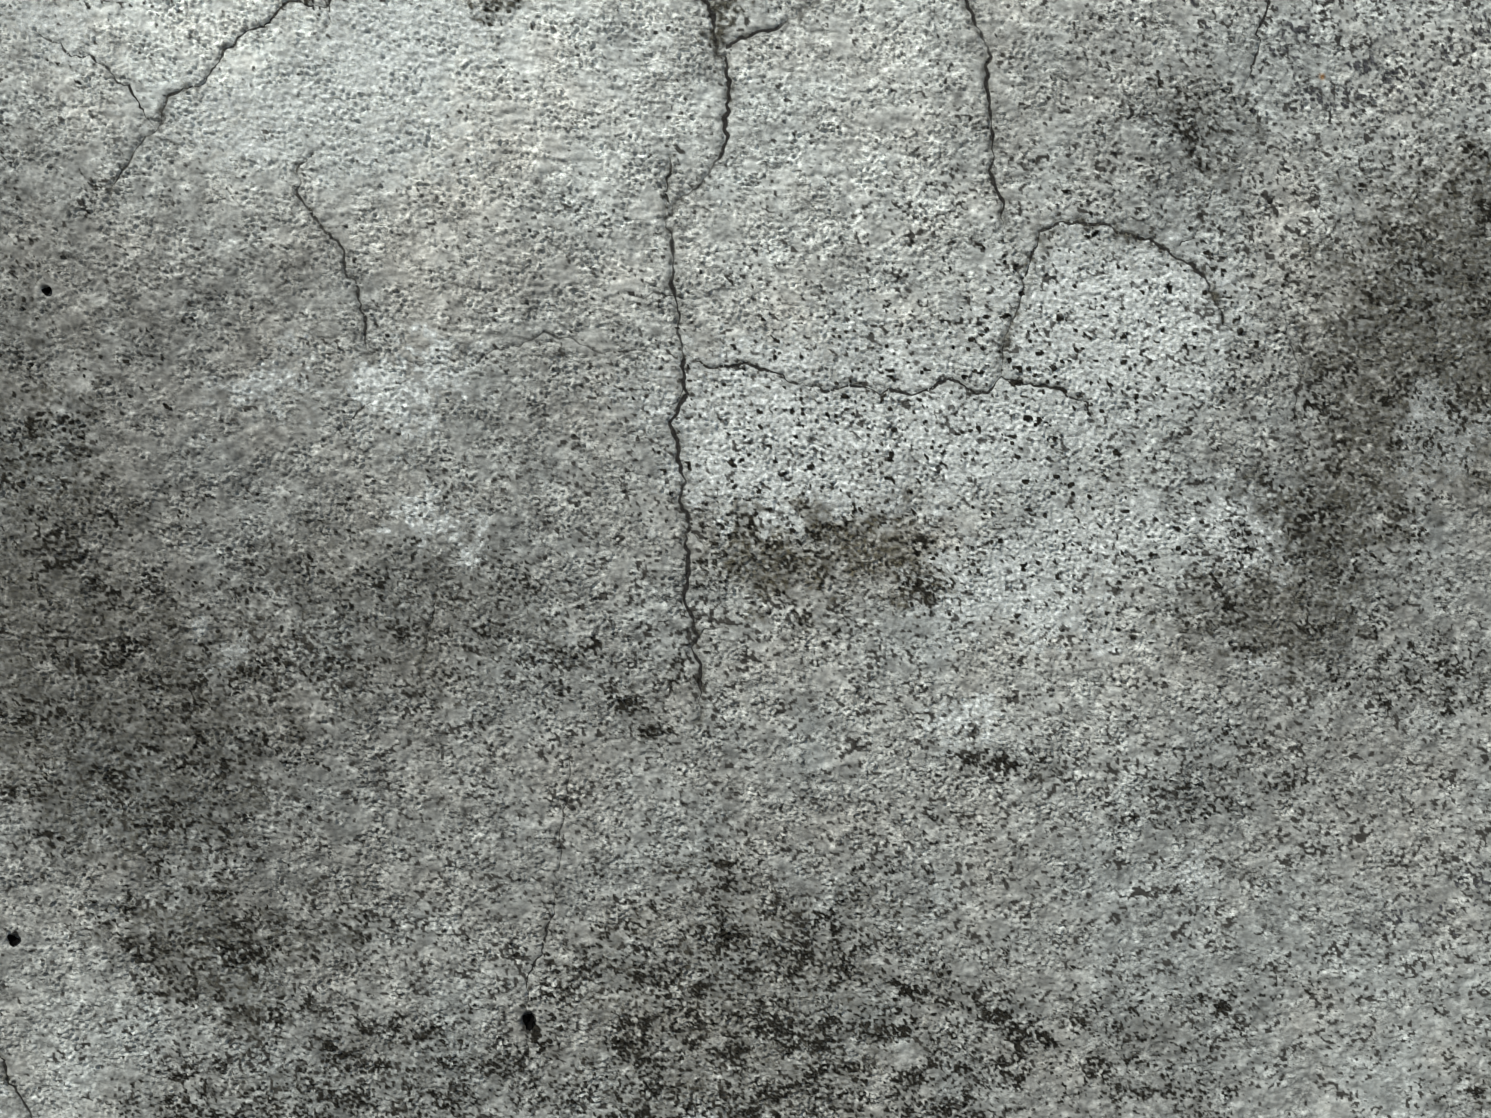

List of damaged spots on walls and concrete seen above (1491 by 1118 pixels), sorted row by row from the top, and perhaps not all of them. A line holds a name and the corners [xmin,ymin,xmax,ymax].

crack [43,0,331,184]
damp [3,255,61,320]
crack [296,162,367,344]
crack [467,331,633,367]
crack [632,0,1225,722]
damp [1136,0,1491,717]
damp [0,344,1336,1118]